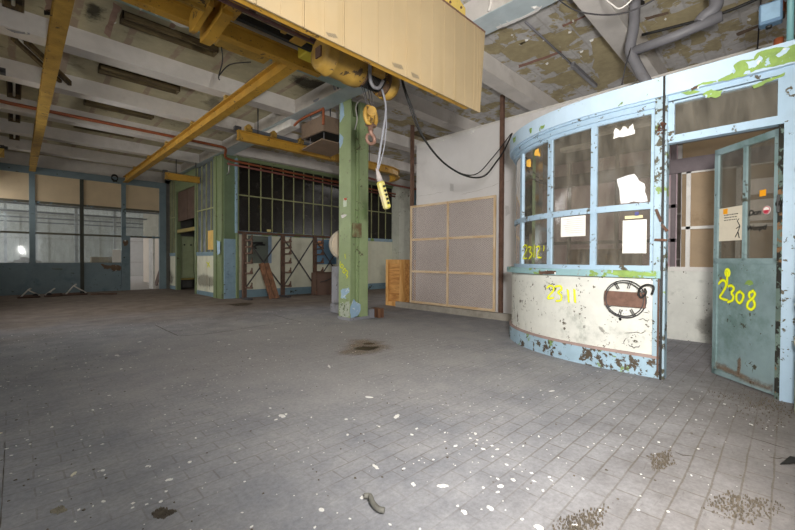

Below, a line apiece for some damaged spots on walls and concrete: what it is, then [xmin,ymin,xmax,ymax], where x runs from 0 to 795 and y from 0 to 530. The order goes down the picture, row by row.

peeling [496,6,542,29]
peeling [644,0,709,31]
peeling [736,10,759,36]
peeling [501,39,562,68]
peeling [579,36,630,89]
peeling [674,31,706,51]
peeling [683,44,795,98]